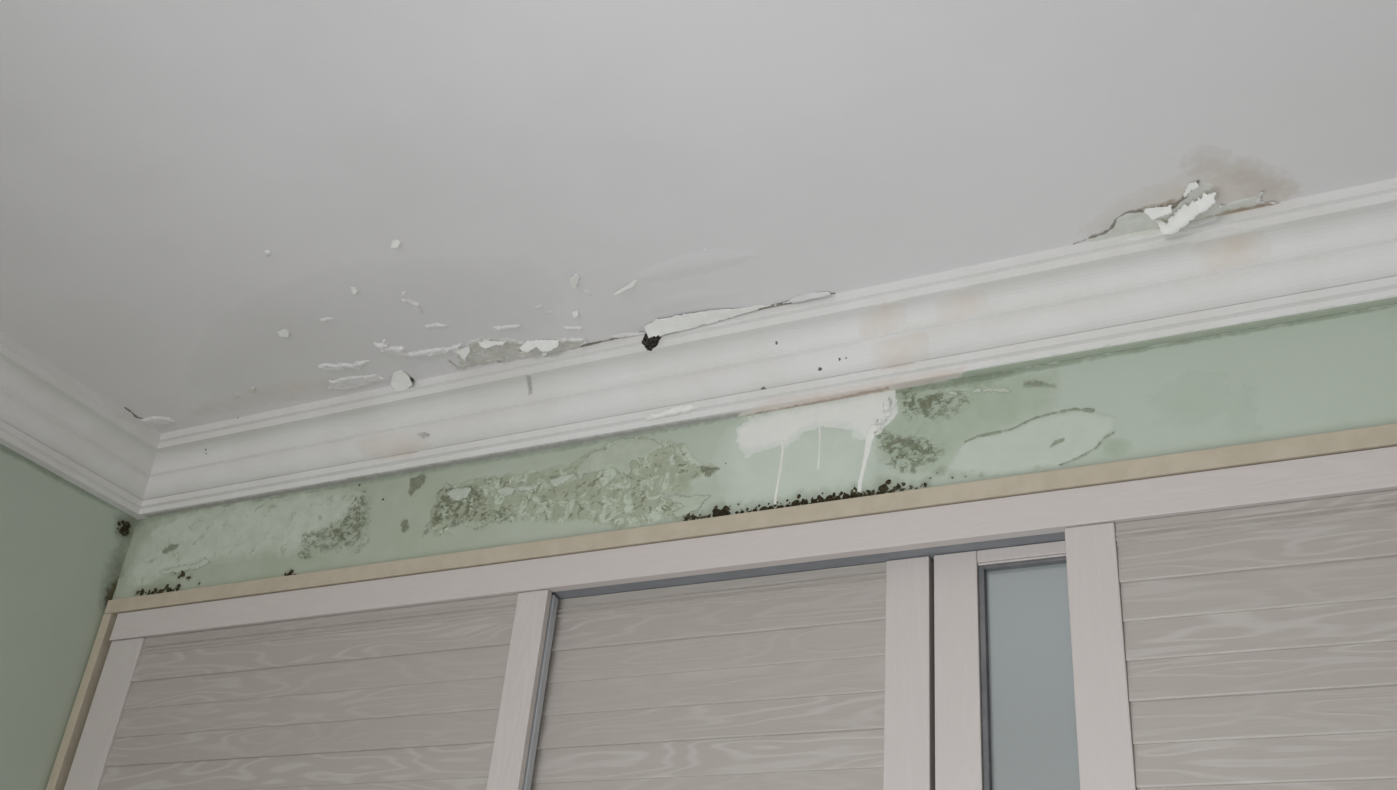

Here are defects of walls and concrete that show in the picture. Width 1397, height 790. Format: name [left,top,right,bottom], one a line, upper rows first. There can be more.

peeling [1073,180,1276,245]
peeling [448,291,835,371]
peeling [390,370,414,393]
damp [682,286,1061,521]
peeling [409,475,425,496]
flaking render [426,404,720,538]
damp [117,520,132,536]
peeling [123,484,384,593]
damp [135,571,201,596]